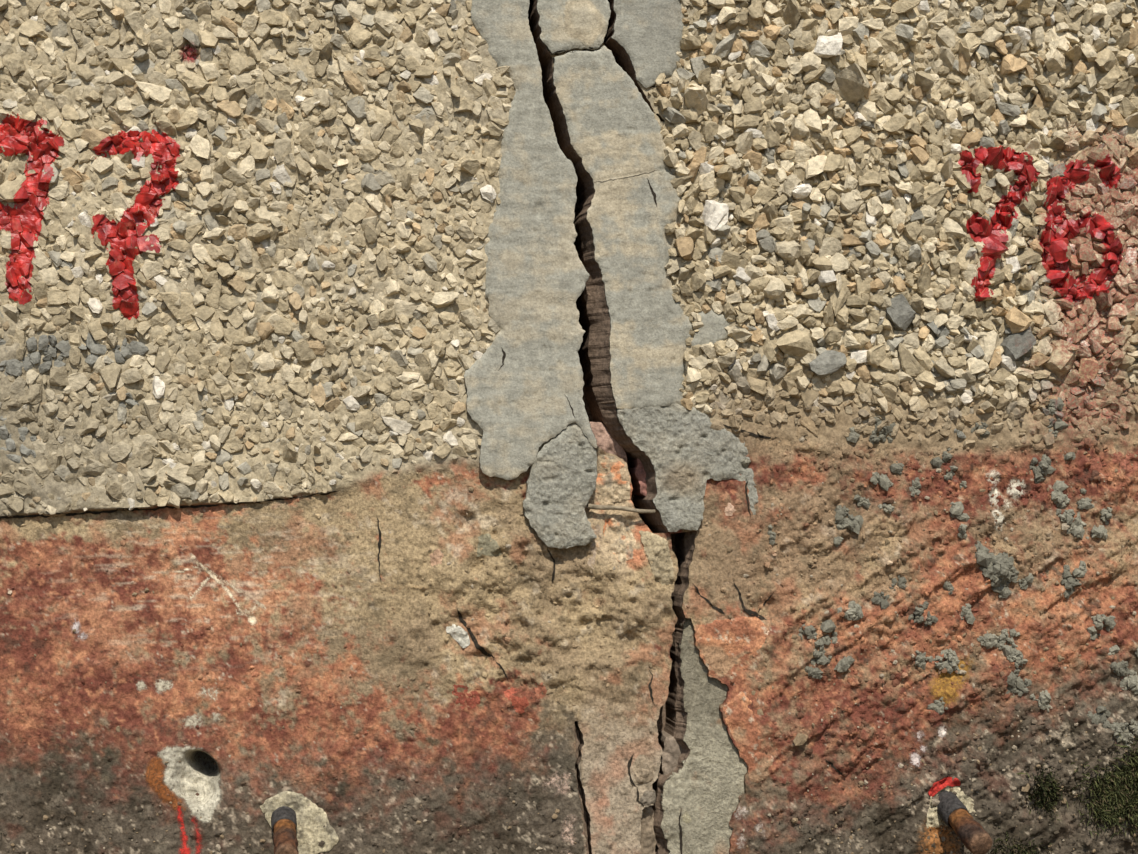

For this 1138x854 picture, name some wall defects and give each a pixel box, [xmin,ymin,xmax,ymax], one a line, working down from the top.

crack [528,0,778,854]
rust [930,659,970,704]
spalling [157,746,221,822]